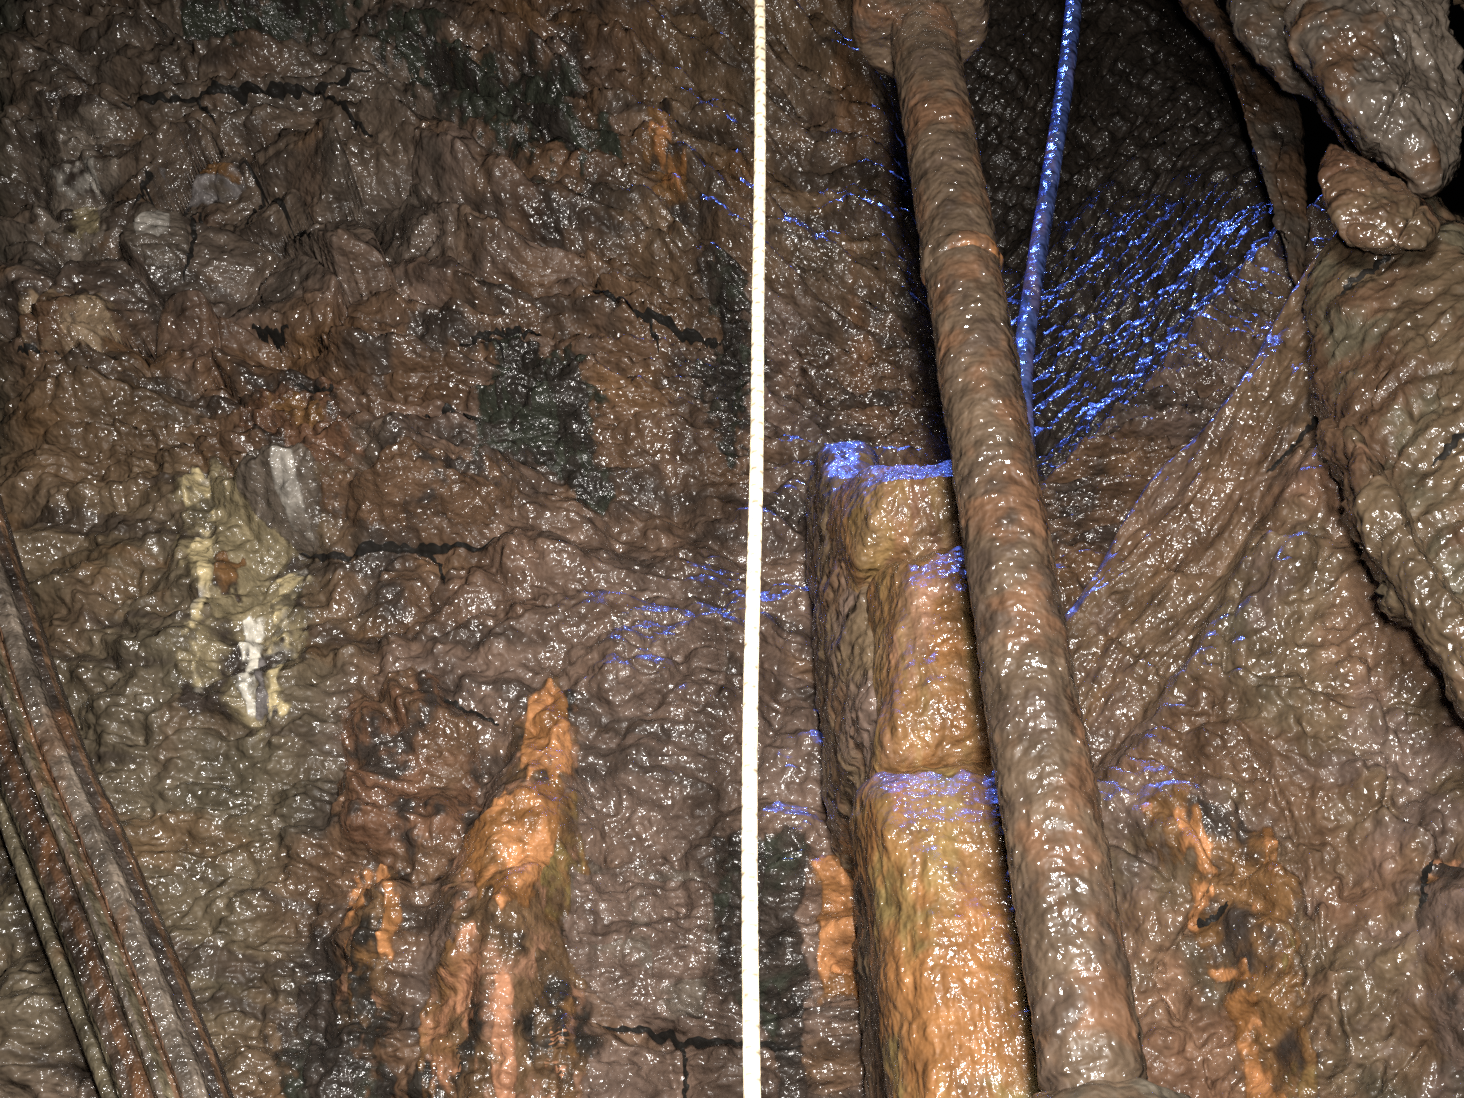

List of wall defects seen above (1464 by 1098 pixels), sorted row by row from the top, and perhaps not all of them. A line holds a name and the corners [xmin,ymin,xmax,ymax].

water stain [474,333,615,515]
water stain [168,456,311,740]
corrosion [331,864,402,1065]
corrosion [407,676,603,1098]
crack [596,1023,804,1098]
corrosion [1141,781,1320,1098]